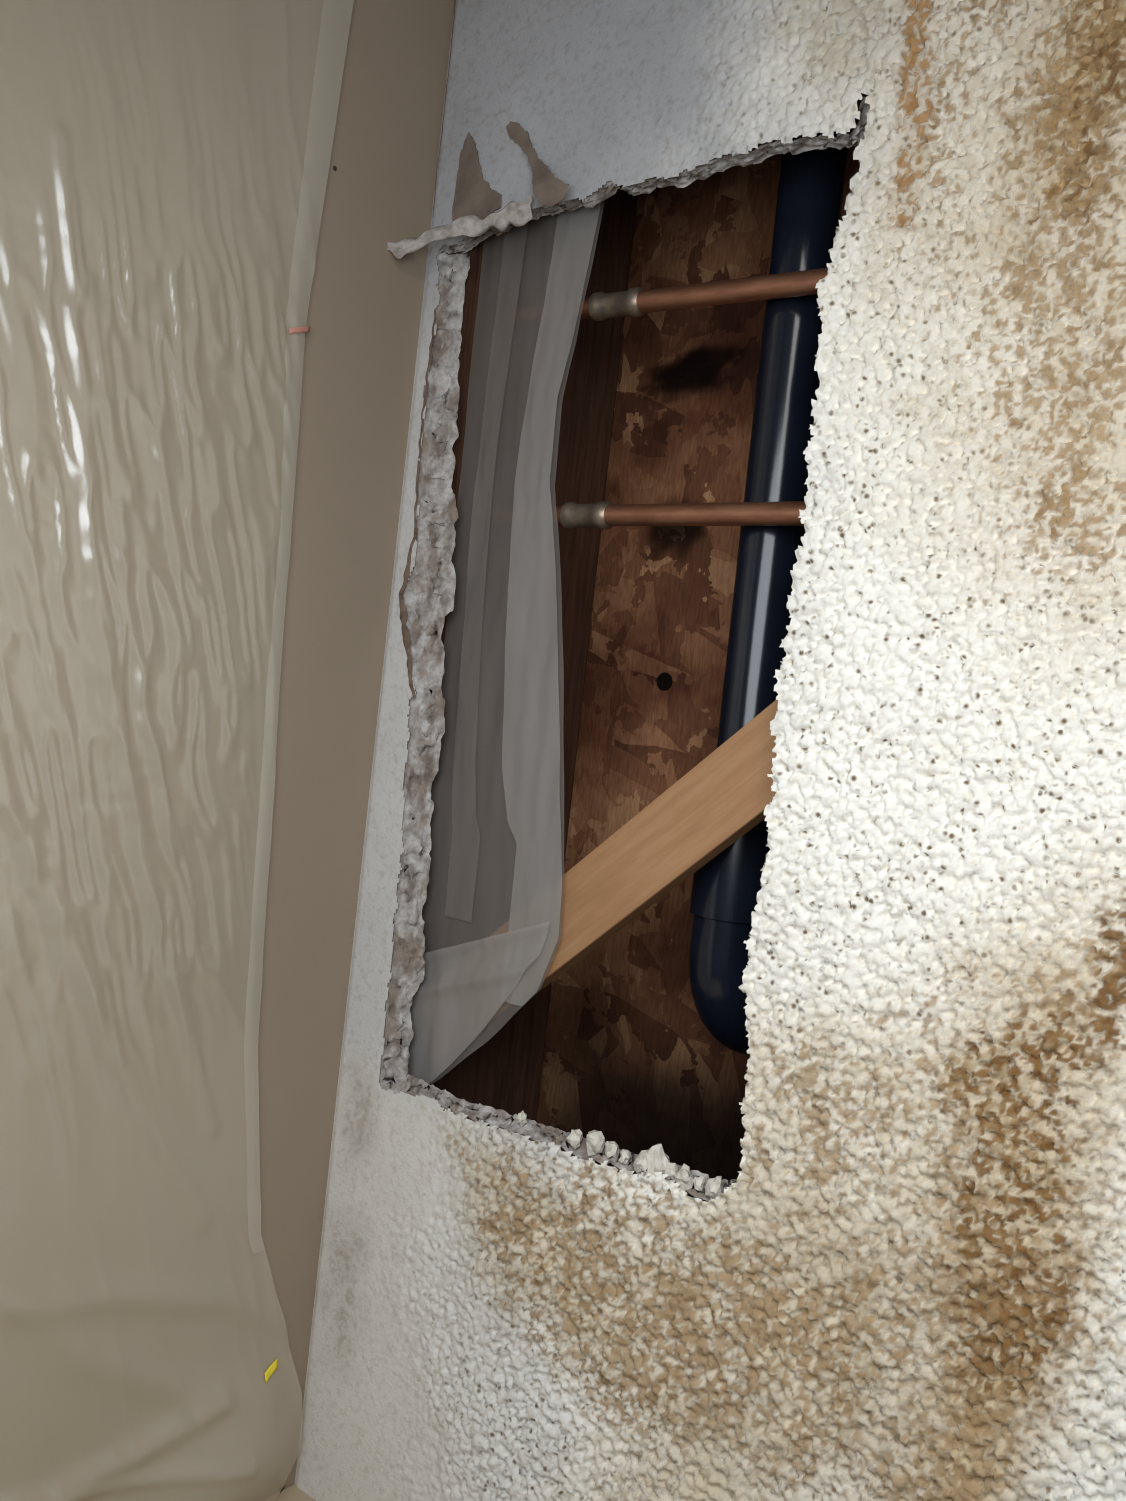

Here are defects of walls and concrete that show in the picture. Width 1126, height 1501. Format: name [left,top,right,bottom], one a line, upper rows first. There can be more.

water stain [922,0,1126,581]
spalling [379,97,870,1202]
water stain [459,899,1126,1501]